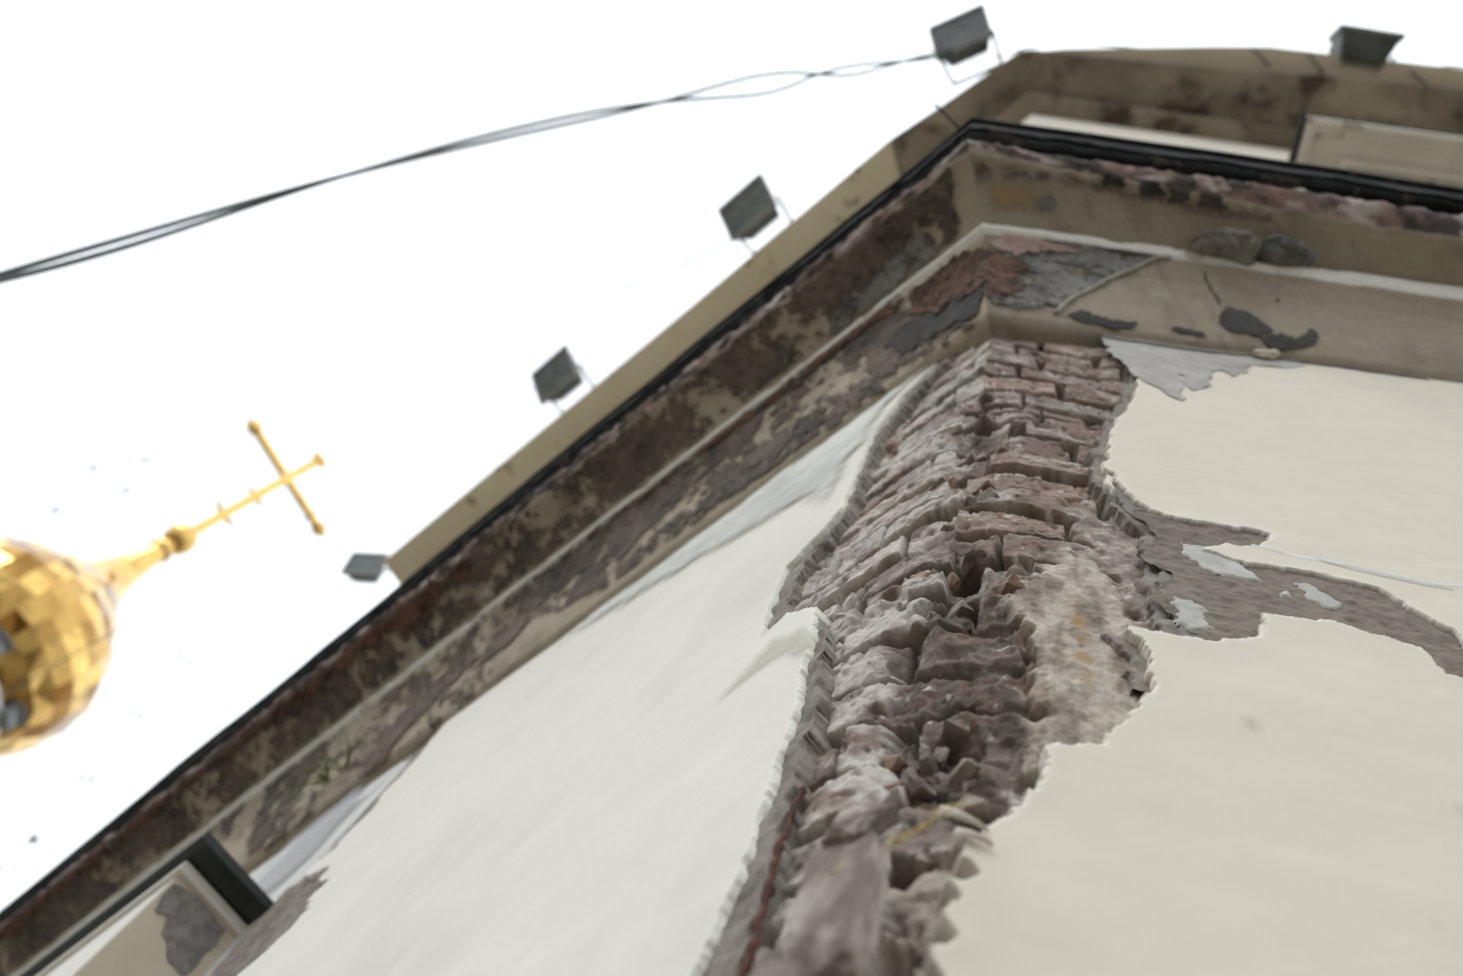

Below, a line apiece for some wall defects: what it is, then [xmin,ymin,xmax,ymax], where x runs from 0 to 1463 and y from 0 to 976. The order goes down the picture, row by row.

spalling [702,306,1463,976]
crack [1251,544,1463,590]
spalling [155,744,427,976]